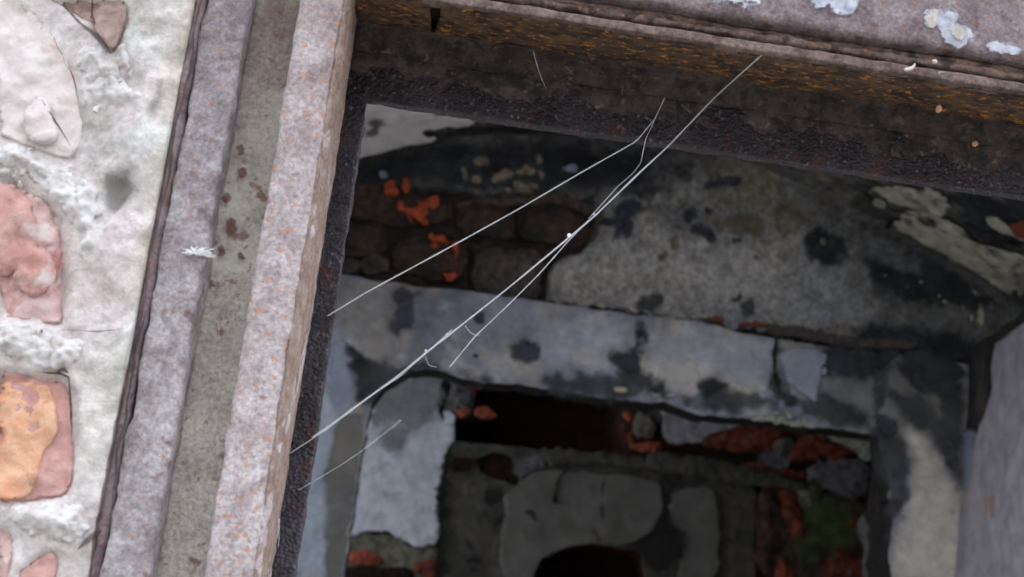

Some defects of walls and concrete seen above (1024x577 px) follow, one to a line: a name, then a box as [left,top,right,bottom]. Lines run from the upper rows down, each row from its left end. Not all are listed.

peeling [812,0,858,15]
peeling [924,9,974,48]
peeling [986,41,1020,55]
corrosion [226,218,237,235]